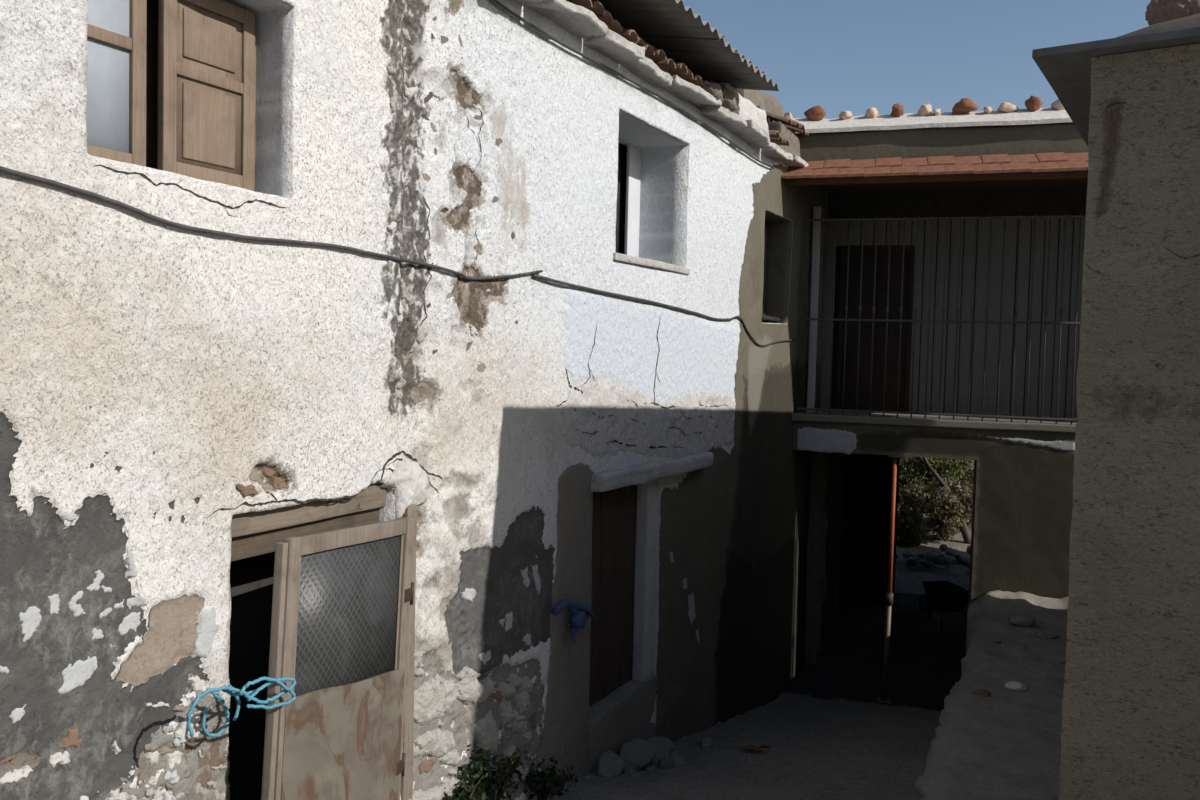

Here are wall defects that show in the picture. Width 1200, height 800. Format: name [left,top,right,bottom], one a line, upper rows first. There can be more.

crack [93,165,286,217]
spalling [441,161,509,351]
spalling [384,314,444,406]
crack [555,322,727,449]
spalling [561,379,736,459]
spalling [236,457,297,497]
crack [204,451,443,518]
flaking render [0,409,229,800]
spalling [409,506,555,800]